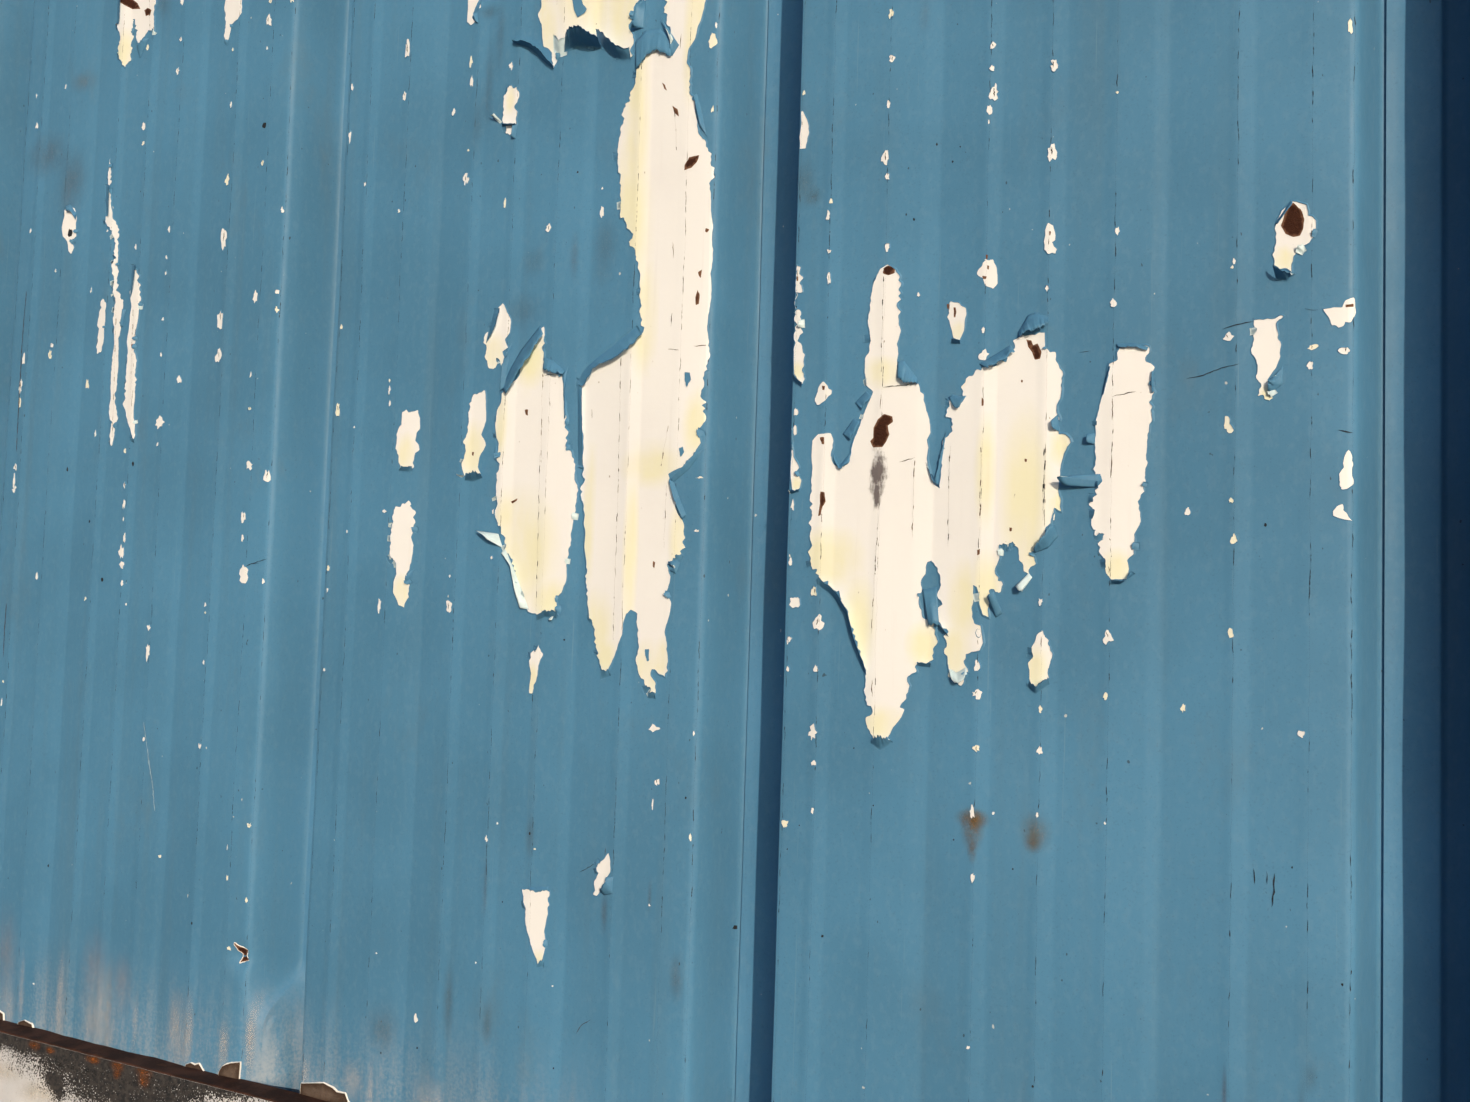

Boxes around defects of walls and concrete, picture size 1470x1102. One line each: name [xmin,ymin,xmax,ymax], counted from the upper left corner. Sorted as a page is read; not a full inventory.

peeling [115,0,158,69]
peeling [1271,200,1319,281]
peeling [90,159,165,453]
peeling [456,0,718,699]
peeling [1222,314,1285,402]
peeling [1306,297,1357,370]
peeling [388,379,421,472]
peeling [788,242,1157,751]
peeling [377,500,419,614]
peeling [527,645,543,719]
peeling [521,887,551,968]